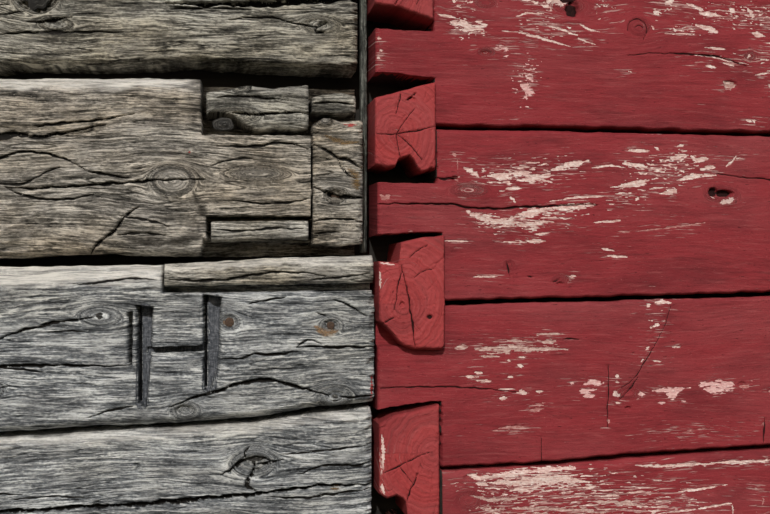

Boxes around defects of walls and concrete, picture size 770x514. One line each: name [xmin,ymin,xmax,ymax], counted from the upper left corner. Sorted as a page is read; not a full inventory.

crack [383,246,432,344]